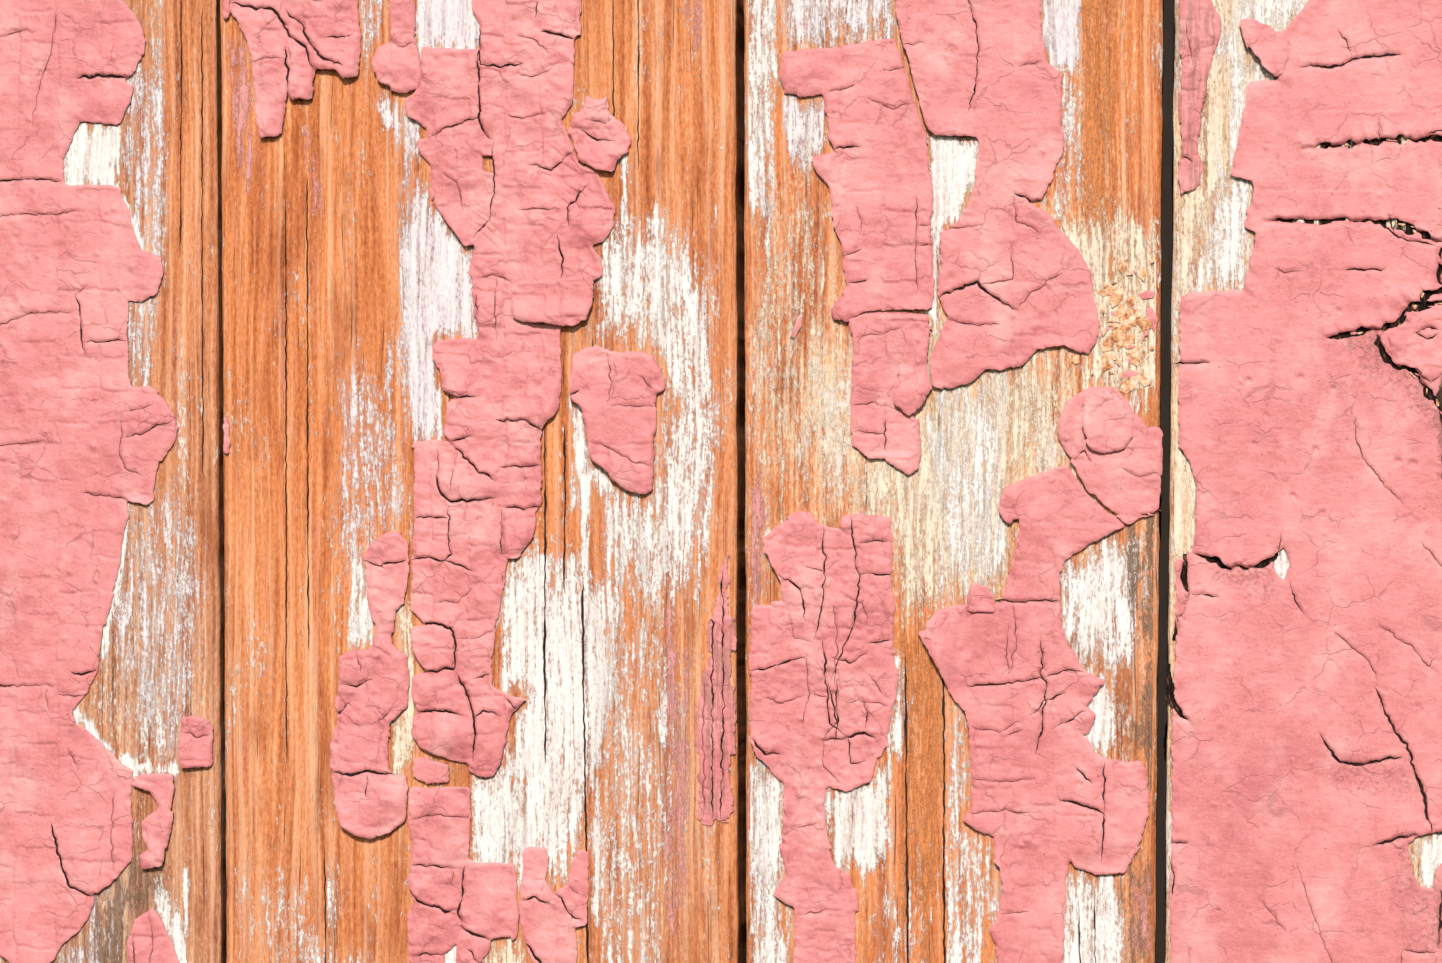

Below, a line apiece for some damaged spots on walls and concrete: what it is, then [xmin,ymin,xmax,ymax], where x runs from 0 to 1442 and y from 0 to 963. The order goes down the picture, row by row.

peeling [779,0,1100,475]
crack [1303,32,1399,69]
crack [1276,214,1442,420]
crack [1320,123,1442,149]
peeling [1388,310,1442,383]
peeling [0,0,214,963]
peeling [222,0,665,963]
peeling [694,511,899,963]
peeling [918,386,1196,963]
crack [1165,537,1303,720]
crack [1320,623,1442,844]
crack [1401,890,1442,962]